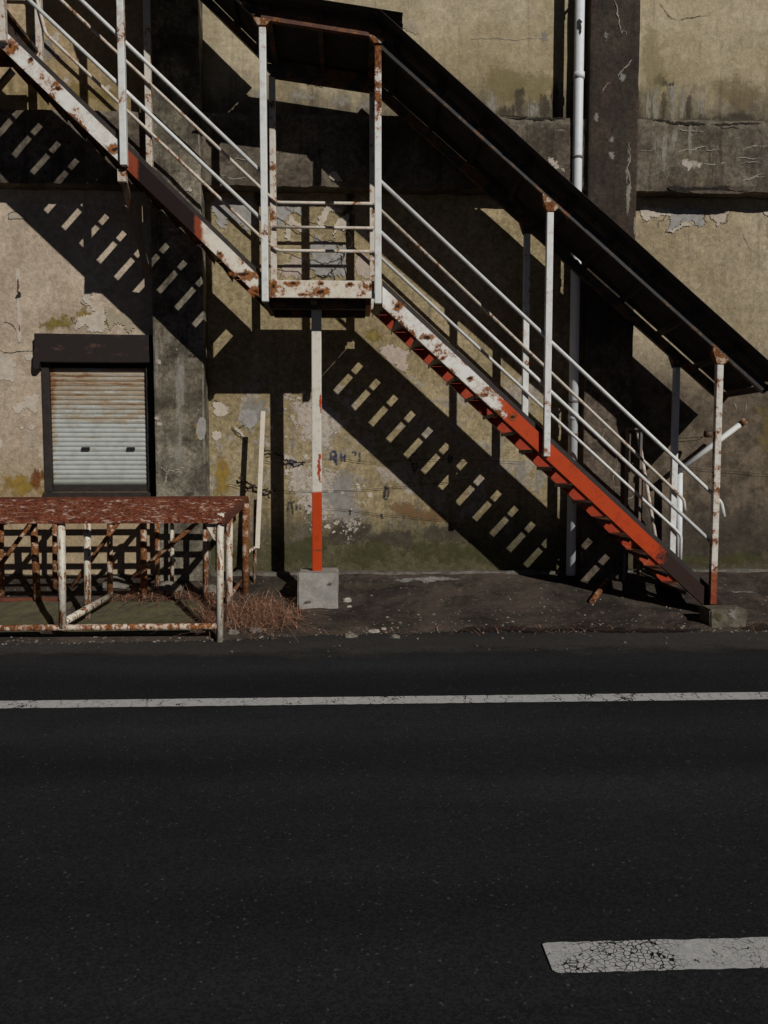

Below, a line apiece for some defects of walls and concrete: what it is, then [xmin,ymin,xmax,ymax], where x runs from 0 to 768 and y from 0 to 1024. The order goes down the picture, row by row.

damp [487,84,559,118]
damp [638,74,768,167]
peeling [211,197,258,232]
peeling [640,205,729,233]
peeling [277,204,370,279]
rust [229,269,262,295]
damp [322,516,464,549]